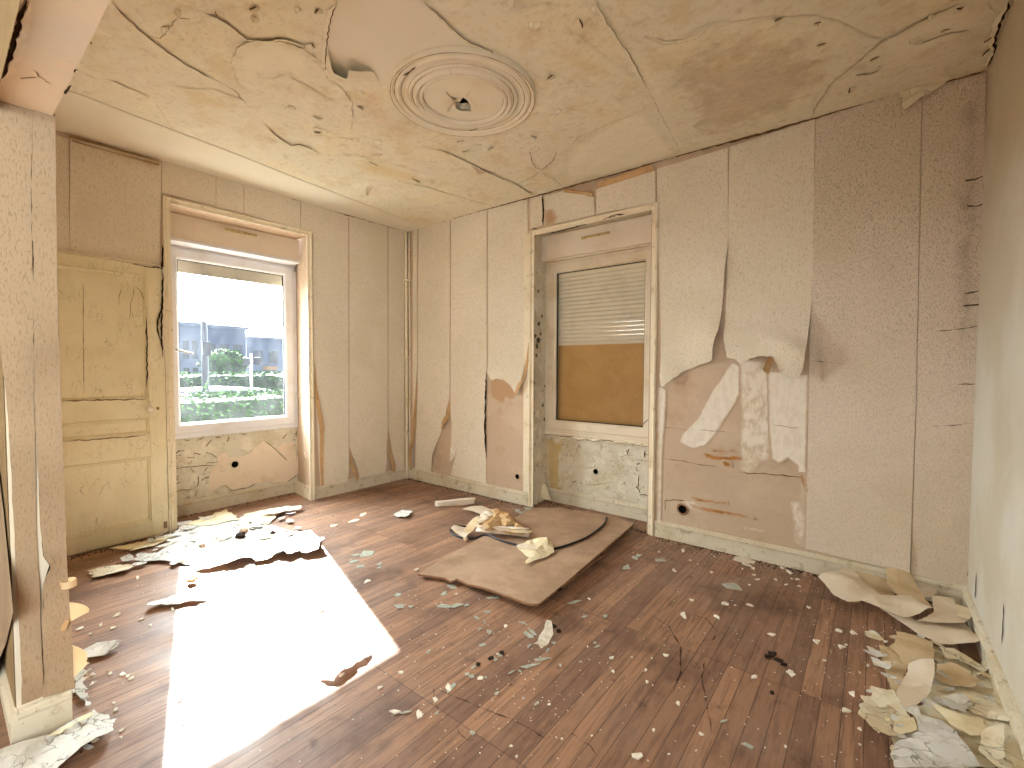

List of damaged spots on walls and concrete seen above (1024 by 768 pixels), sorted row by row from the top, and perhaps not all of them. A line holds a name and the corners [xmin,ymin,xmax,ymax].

crack [1,0,372,208]
peeling [304,0,477,110]
crack [422,0,680,235]
crack [811,1,1010,119]
crack [69,246,167,402]
peeling [176,430,306,496]
peeling [534,409,648,499]